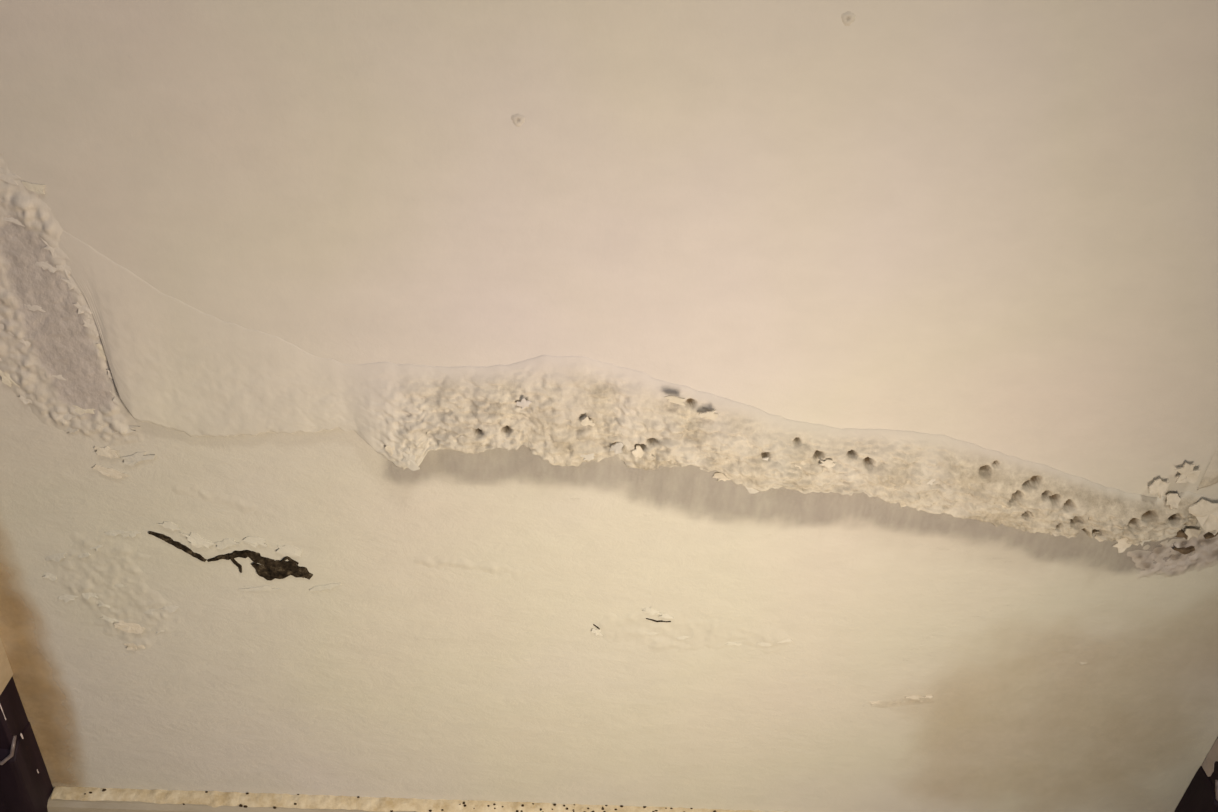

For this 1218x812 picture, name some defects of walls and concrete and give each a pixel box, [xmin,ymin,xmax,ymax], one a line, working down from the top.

crack [148,521,341,592]